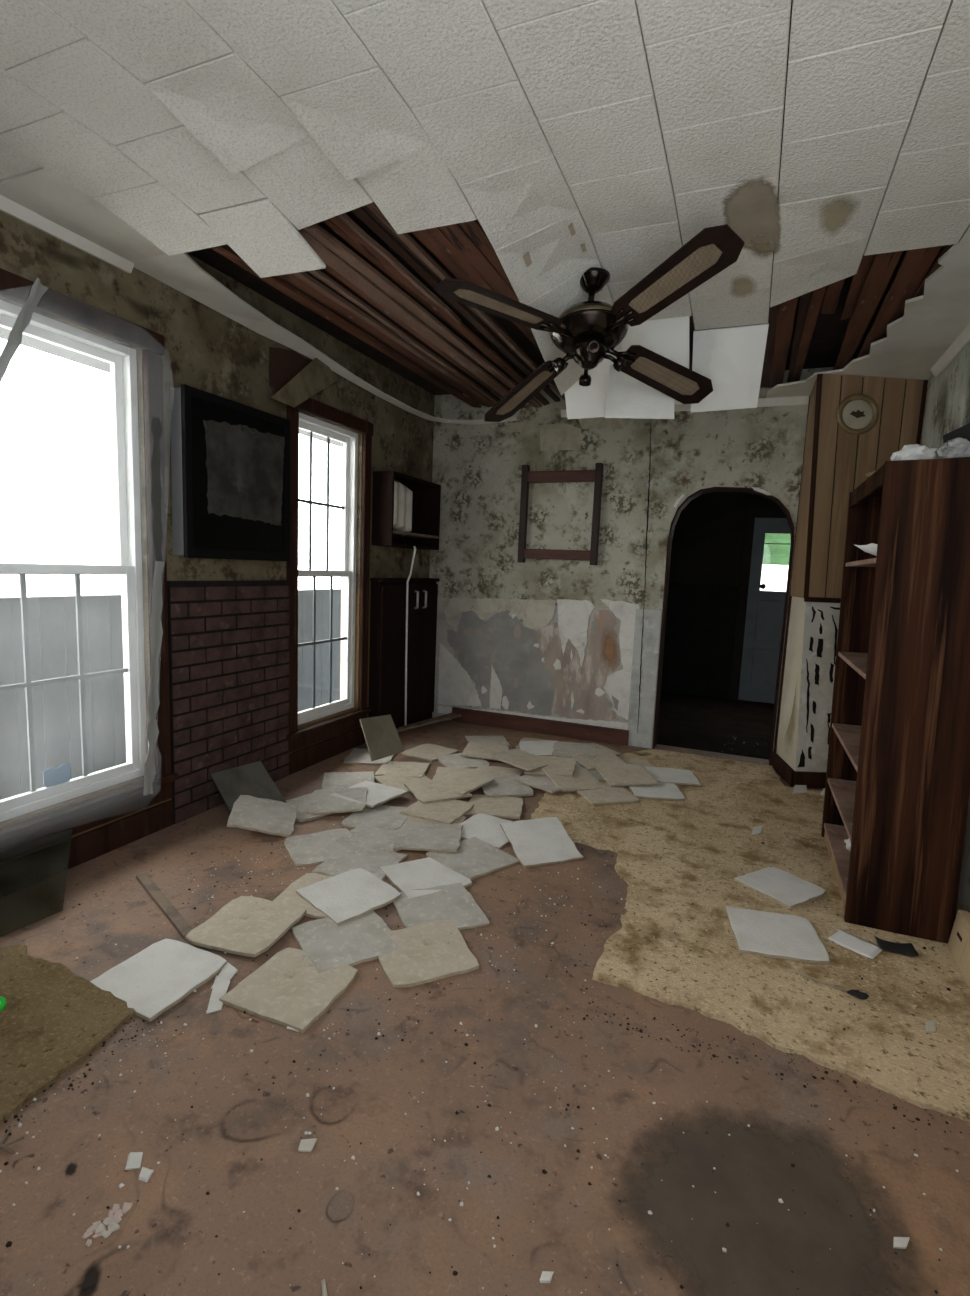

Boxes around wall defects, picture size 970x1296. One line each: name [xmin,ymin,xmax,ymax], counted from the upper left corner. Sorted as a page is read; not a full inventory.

water stain [725,179,780,255]
flaking render [211,201,541,408]
flaking render [744,244,954,388]
flaking render [522,380,565,408]
peeling [438,598,639,730]
water stain [619,1116,916,1296]